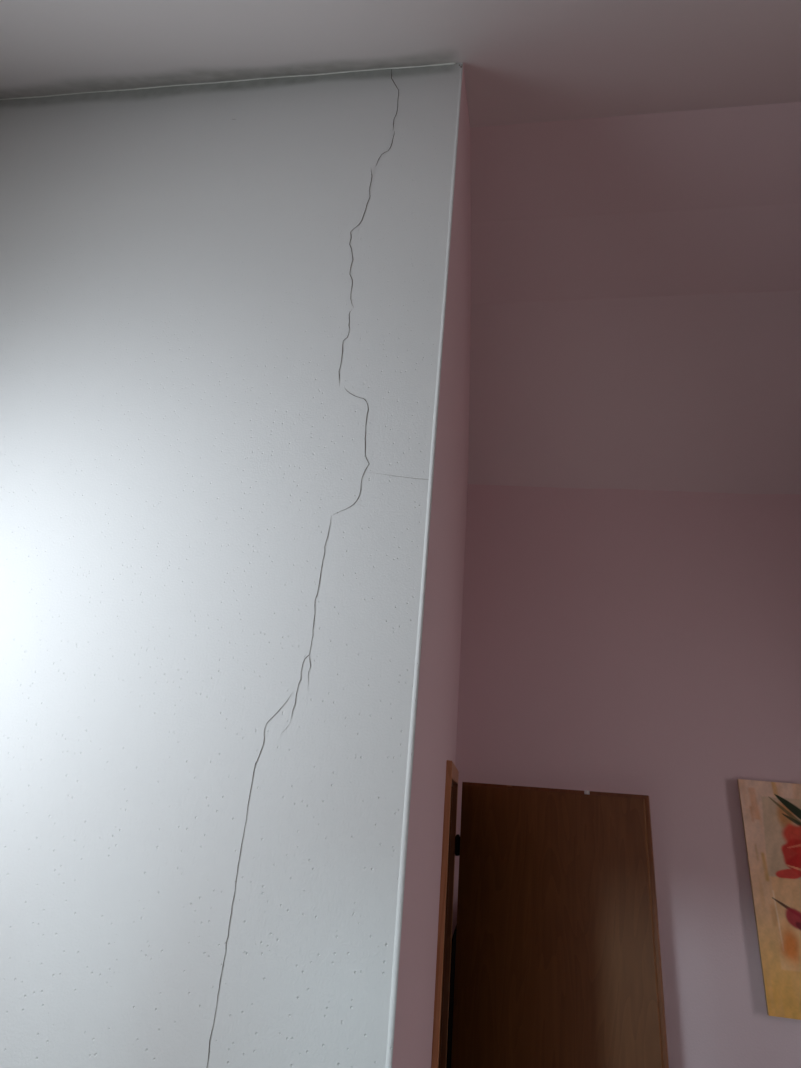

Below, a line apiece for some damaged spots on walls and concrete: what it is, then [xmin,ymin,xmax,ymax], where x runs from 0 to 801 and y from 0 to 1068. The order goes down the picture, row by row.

crack [207,69,429,1065]